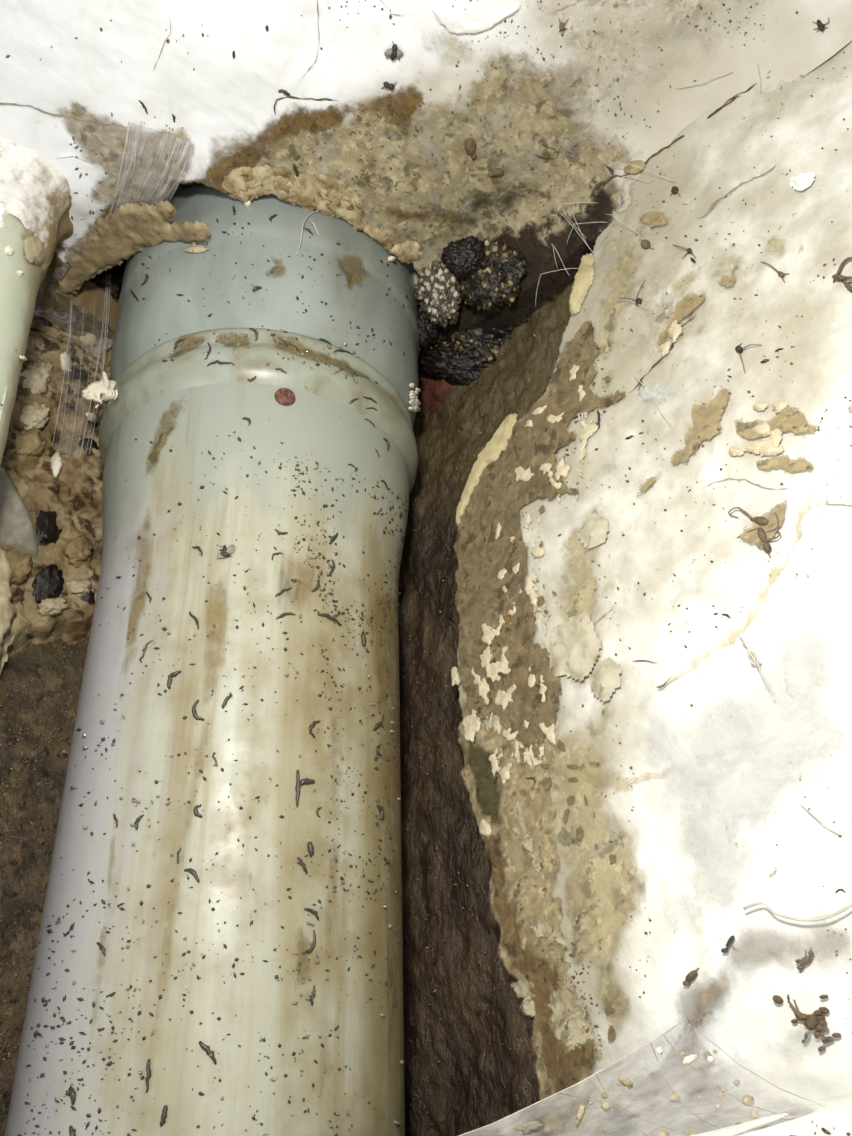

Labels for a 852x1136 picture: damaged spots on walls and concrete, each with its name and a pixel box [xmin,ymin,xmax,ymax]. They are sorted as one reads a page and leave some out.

crack [707,83,756,119]
flaking render [222,164,424,264]
water stain [199,0,712,386]
crack [590,135,684,196]
peeling [671,388,729,465]
peeling [728,400,818,472]
peeling [636,477,656,497]
water stain [561,531,597,621]
flaking render [398,249,626,1136]
peeling [618,1075,633,1089]
peeling [682,1054,715,1066]